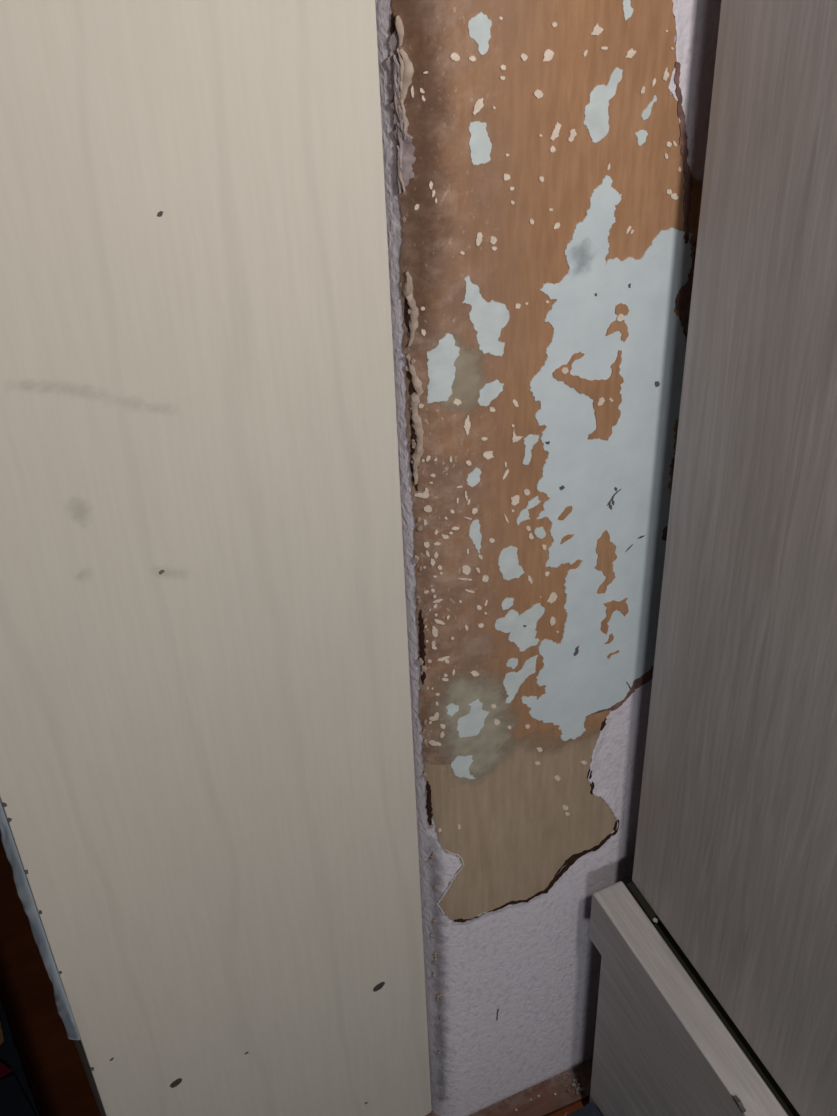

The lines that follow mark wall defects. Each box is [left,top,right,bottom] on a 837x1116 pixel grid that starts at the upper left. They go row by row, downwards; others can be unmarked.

spalling [390,13,428,114]
flaking render [450,12,503,61]
spalling [583,23,608,57]
flaking render [622,0,633,21]
flaking render [468,97,496,165]
flaking render [539,48,636,153]
flaking render [635,67,669,146]
flaking render [402,163,697,746]
flaking render [451,755,475,779]
spalling [423,772,442,832]